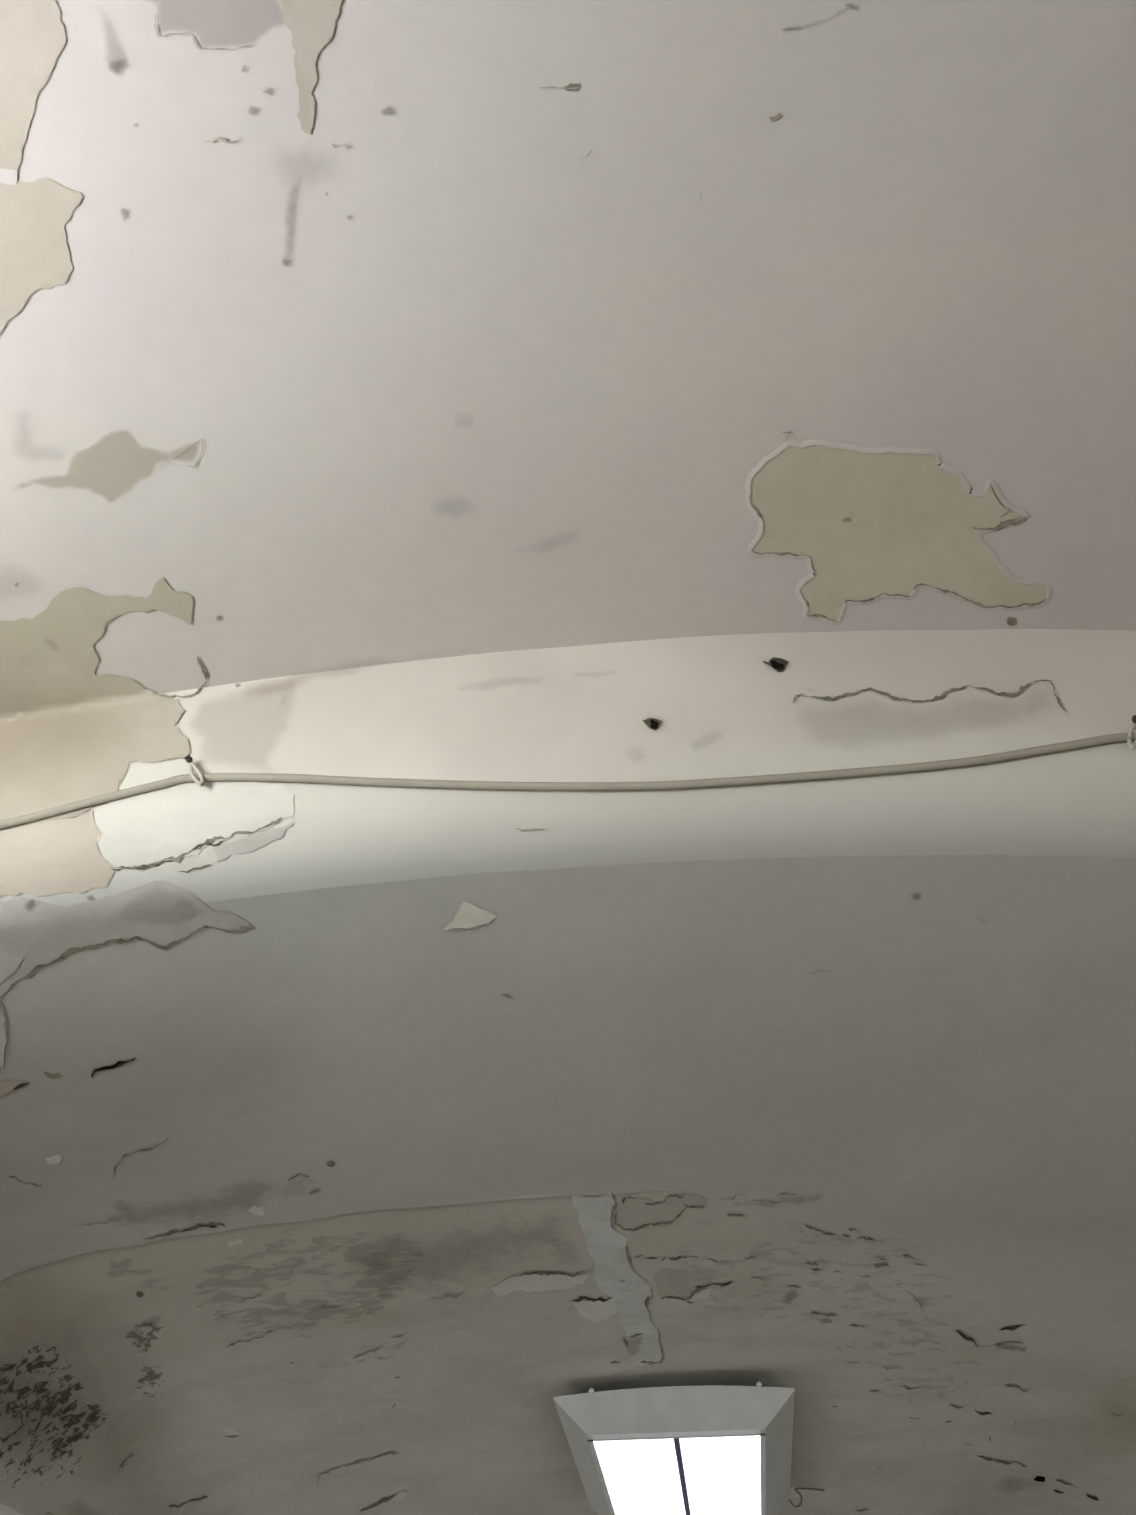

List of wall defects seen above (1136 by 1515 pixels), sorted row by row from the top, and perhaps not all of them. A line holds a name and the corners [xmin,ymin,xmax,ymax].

peeling [0,0,83,334]
peeling [745,432,1053,626]
peeling [0,578,194,821]
peeling [0,880,253,1067]
peeling [432,1271,589,1299]
spalling [804,1224,928,1285]
damp [0,1336,108,1487]
crack [975,1455,1026,1467]